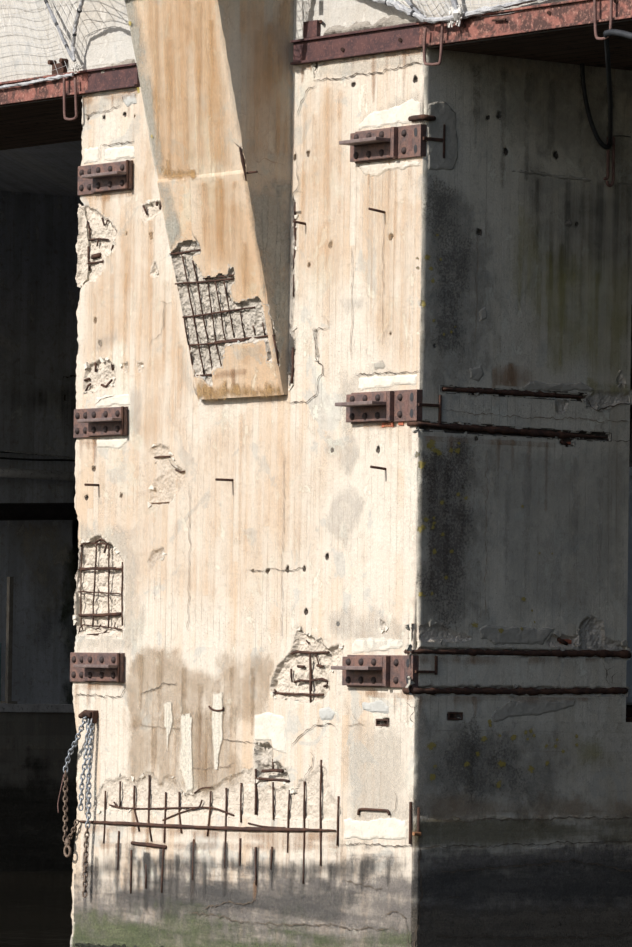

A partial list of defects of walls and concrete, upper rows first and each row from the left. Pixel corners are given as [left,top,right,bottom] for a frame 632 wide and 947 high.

corrosion [160,160,196,180]
spalling [75,204,128,288]
spalling [169,196,299,400]
crack [288,321,328,403]
spalling [73,534,125,638]
water stain [164,702,193,791]
water stain [205,692,223,775]
corrosion [131,841,167,849]
corrosion [79,786,336,832]
spalling [90,741,343,894]
water stain [0,758,632,947]
crack [189,816,632,947]